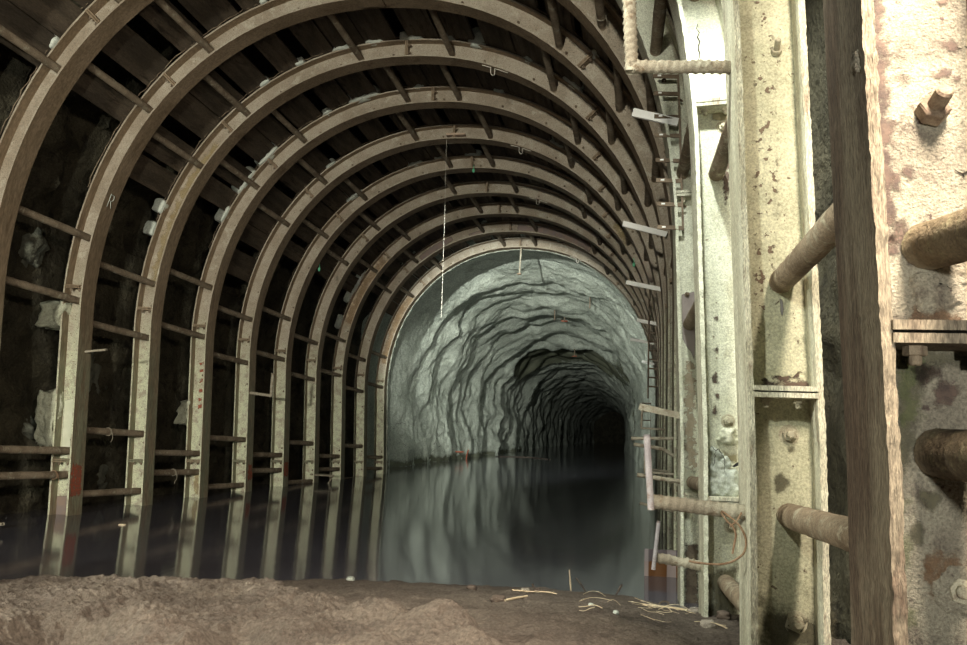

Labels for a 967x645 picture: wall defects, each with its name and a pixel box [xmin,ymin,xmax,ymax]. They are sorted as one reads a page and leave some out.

rust [935,68,961,80]
rust [874,0,915,255]
rust [924,552,962,596]